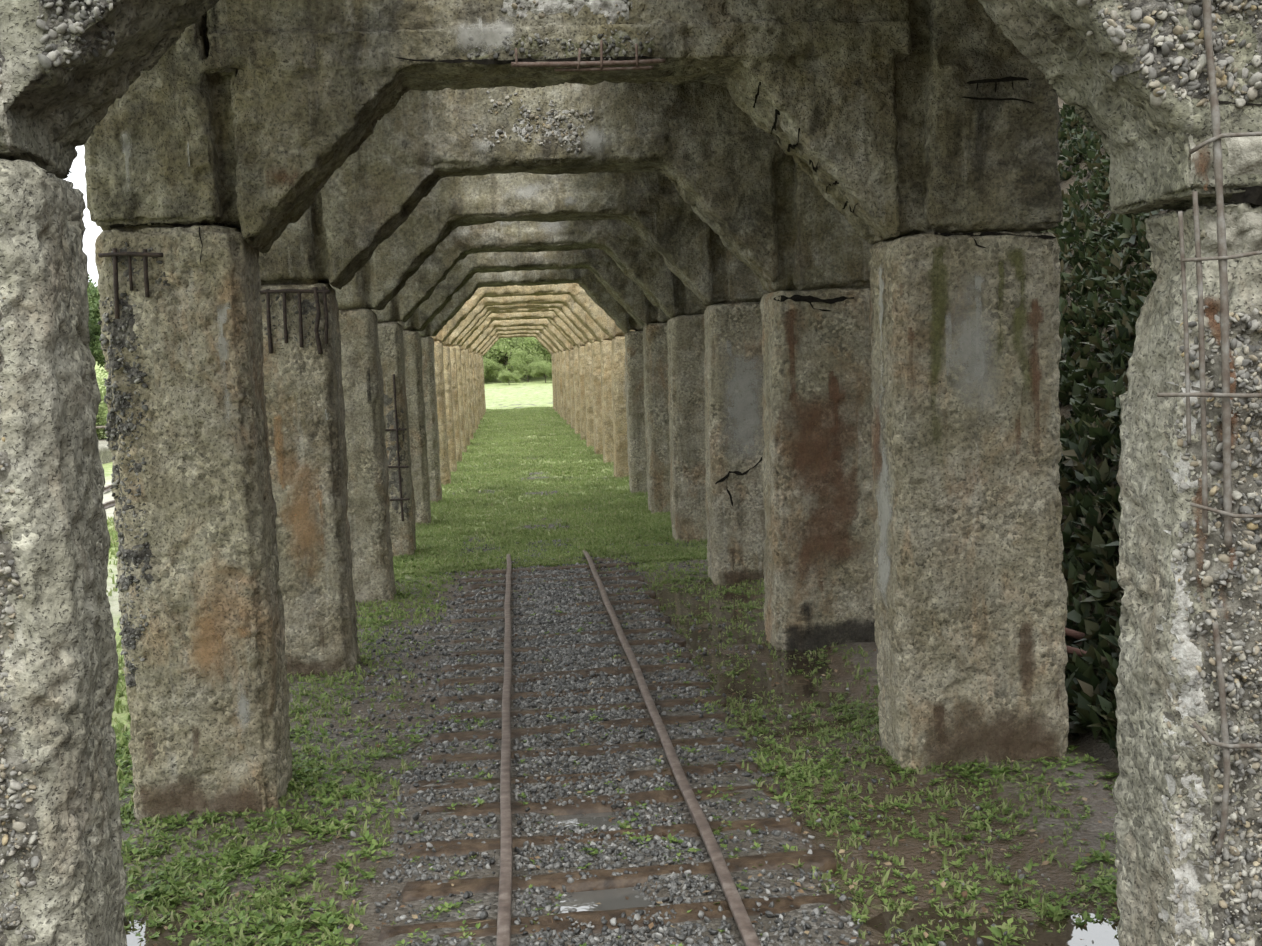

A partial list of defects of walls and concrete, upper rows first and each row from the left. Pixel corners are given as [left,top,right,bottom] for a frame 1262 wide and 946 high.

spalling [467,0,665,72]
crack [753,82,858,213]
crack [774,294,854,312]
damp [945,249,1030,389]
crack [715,456,763,506]
spalling [1077,0,1262,946]